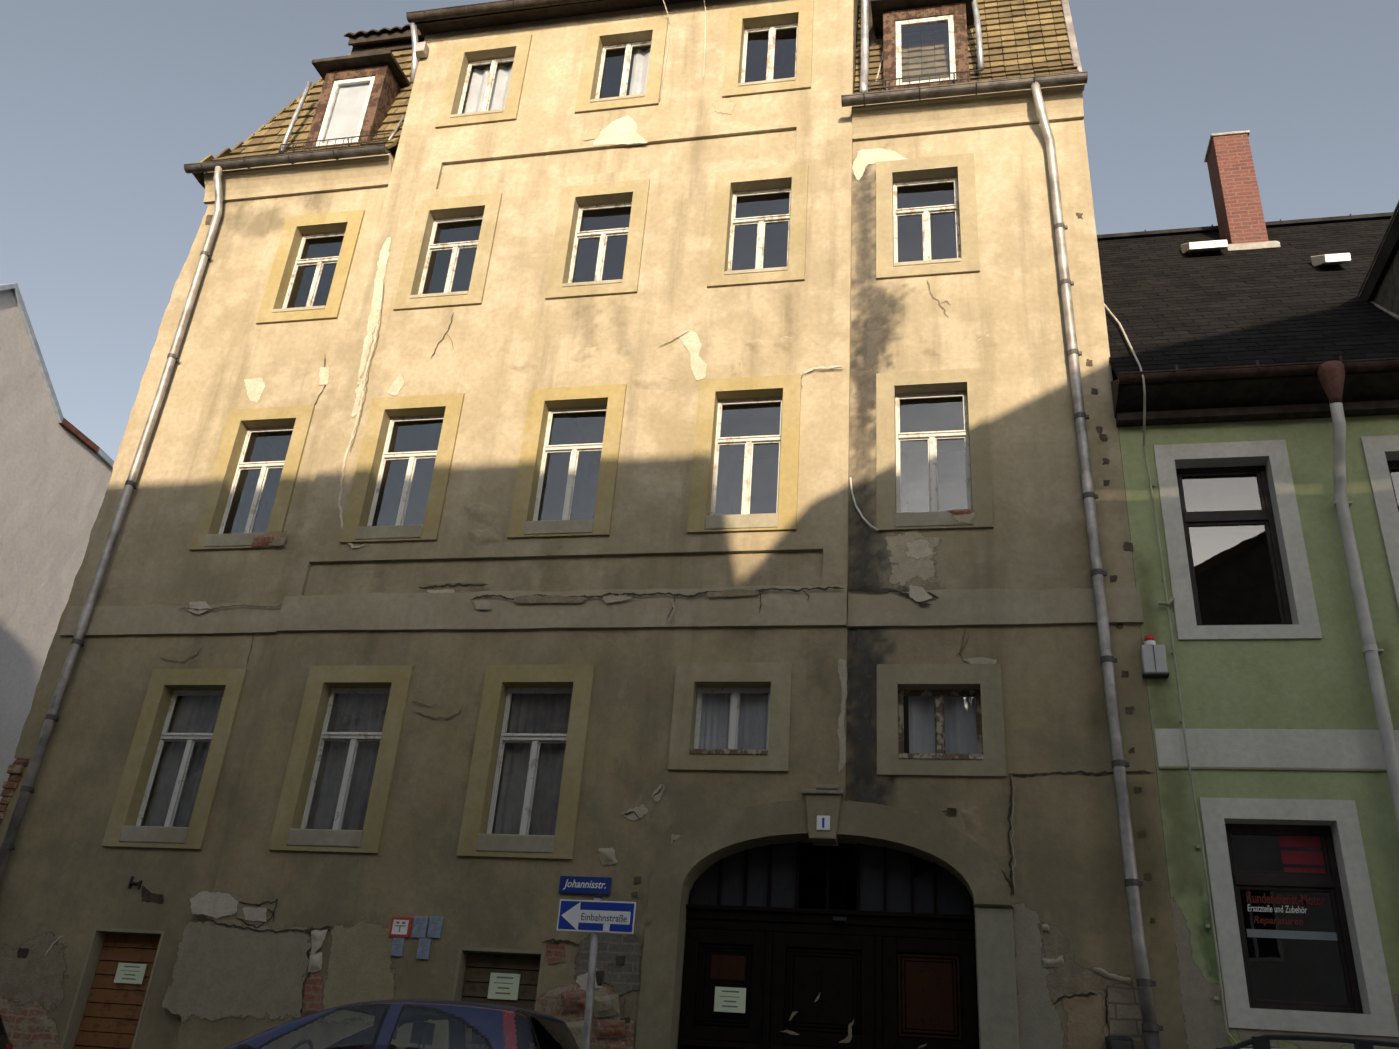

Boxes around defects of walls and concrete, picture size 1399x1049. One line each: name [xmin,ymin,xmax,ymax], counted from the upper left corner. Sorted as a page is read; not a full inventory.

peeling [583,115,648,146]
peeling [852,148,907,180]
peeling [351,237,391,417]
crack [431,314,454,357]
leakage [848,164,897,592]
crack [927,281,952,318]
crack [471,585,940,622]
peeling [884,530,942,591]
leakage [846,627,892,805]
crack [1007,770,1152,897]
flaking render [534,932,643,1049]
peeling [1171,898,1399,1049]